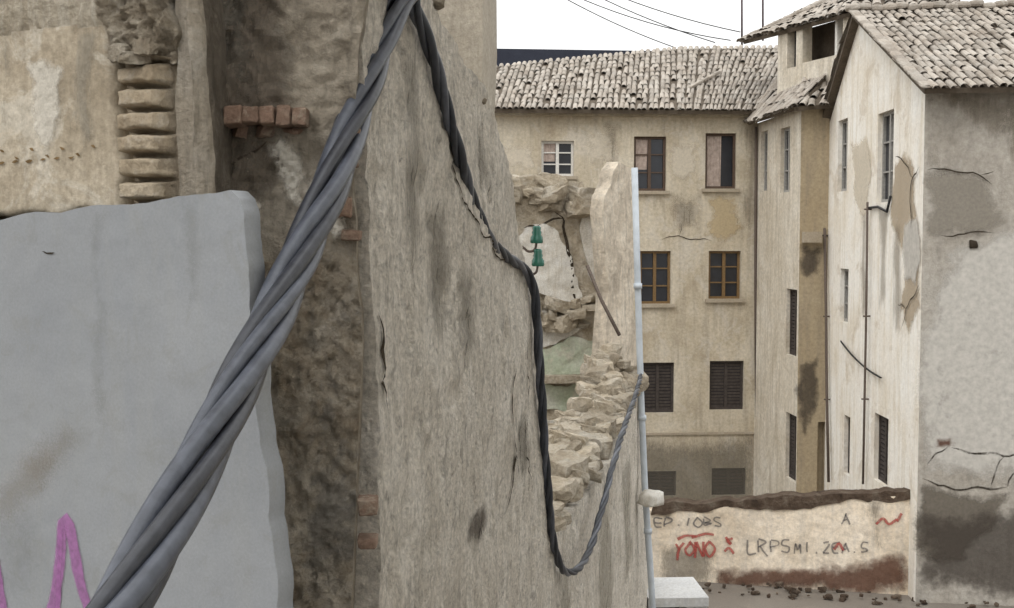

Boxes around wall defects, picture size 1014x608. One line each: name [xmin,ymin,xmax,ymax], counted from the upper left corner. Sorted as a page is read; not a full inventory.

spalling [94,0,182,65]
peeling [0,61,80,165]
peeling [891,158,916,249]
peeling [901,267,919,328]
peeling [542,328,593,423]
crack [925,448,1014,491]
water stain [470,510,486,538]
water stain [923,516,1014,592]